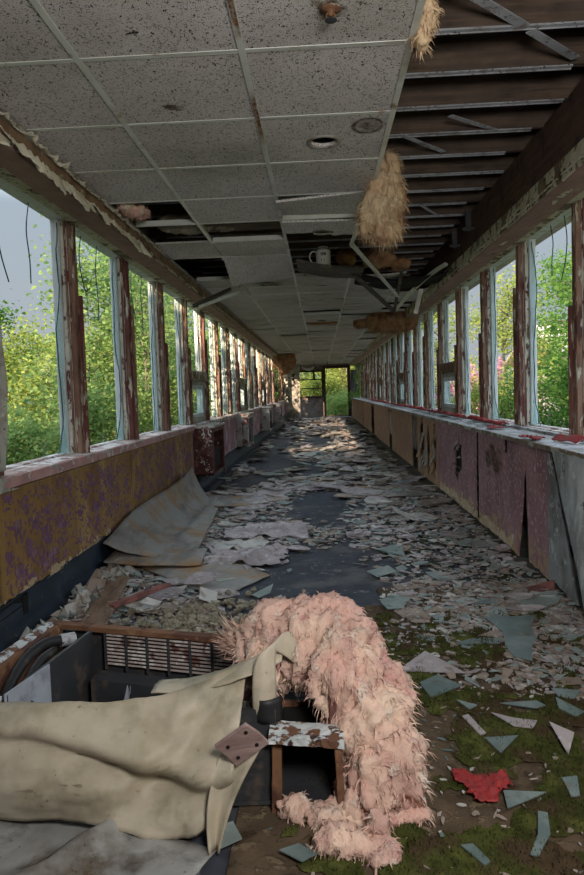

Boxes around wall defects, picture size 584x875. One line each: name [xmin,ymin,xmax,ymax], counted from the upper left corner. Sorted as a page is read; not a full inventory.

peeling [0,112,220,310]
peeling [433,154,583,291]
peeling [0,223,213,604]
spalling [531,241,541,425]
peeling [440,482,513,549]